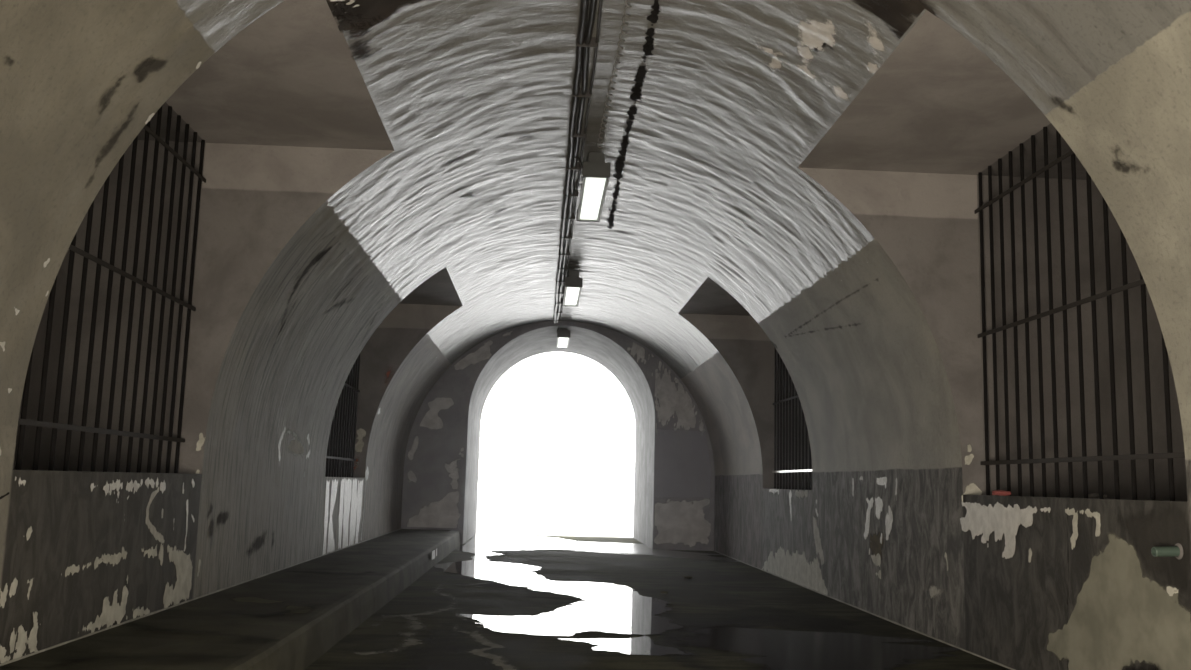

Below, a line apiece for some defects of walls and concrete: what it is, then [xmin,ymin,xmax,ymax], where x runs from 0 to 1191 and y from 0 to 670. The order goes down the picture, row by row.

peeling [964,444,974,465]
peeling [61,547,127,577]
peeling [90,477,166,521]
peeling [141,470,201,608]
peeling [654,498,711,547]
peeling [864,497,893,579]
peeling [960,483,1051,559]
peeling [0,577,33,608]
peeling [82,575,150,633]
flaking render [1047,508,1191,670]
peeling [0,612,41,663]